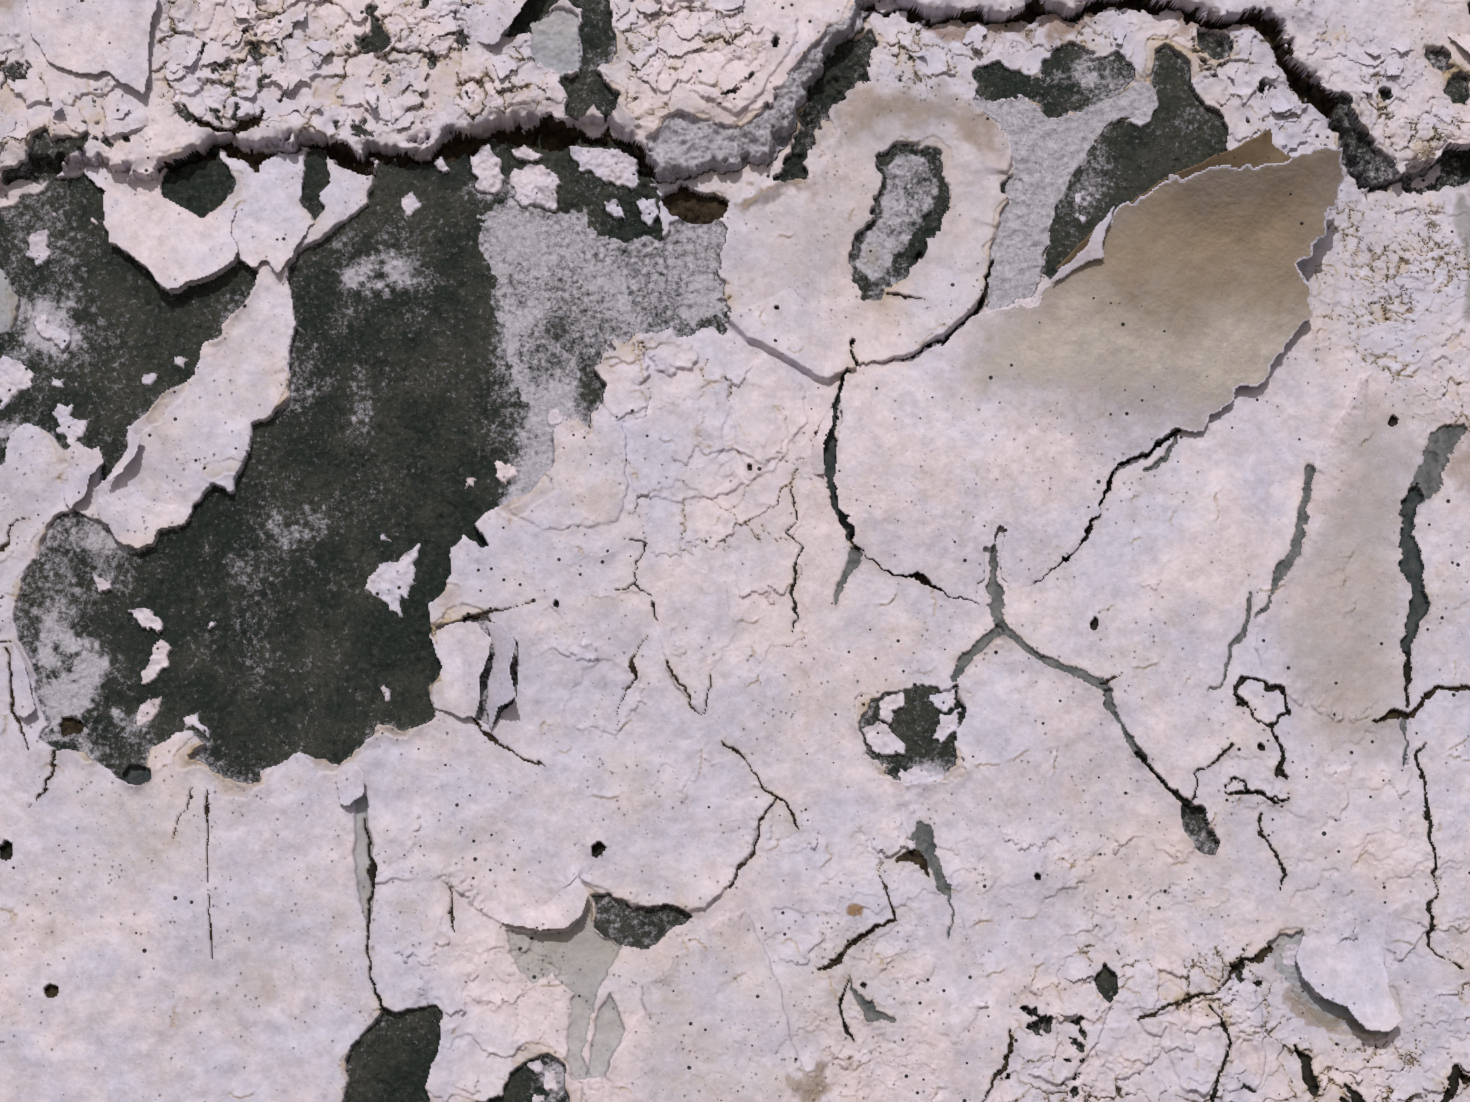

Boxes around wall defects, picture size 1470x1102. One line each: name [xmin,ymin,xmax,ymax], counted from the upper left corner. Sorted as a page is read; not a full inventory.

crack [157,94,659,184]
peeling [646,0,1470,602]
peeling [0,0,833,921]
crack [785,261,1316,891]
crack [1303,191,1470,970]
peeling [859,685,967,786]
peeling [344,1006,443,1102]
peeling [488,876,692,1102]
crack [817,821,955,1042]
crack [1137,945,1274,1102]
peeling [985,899,1470,1102]
crack [1293,1045,1366,1102]